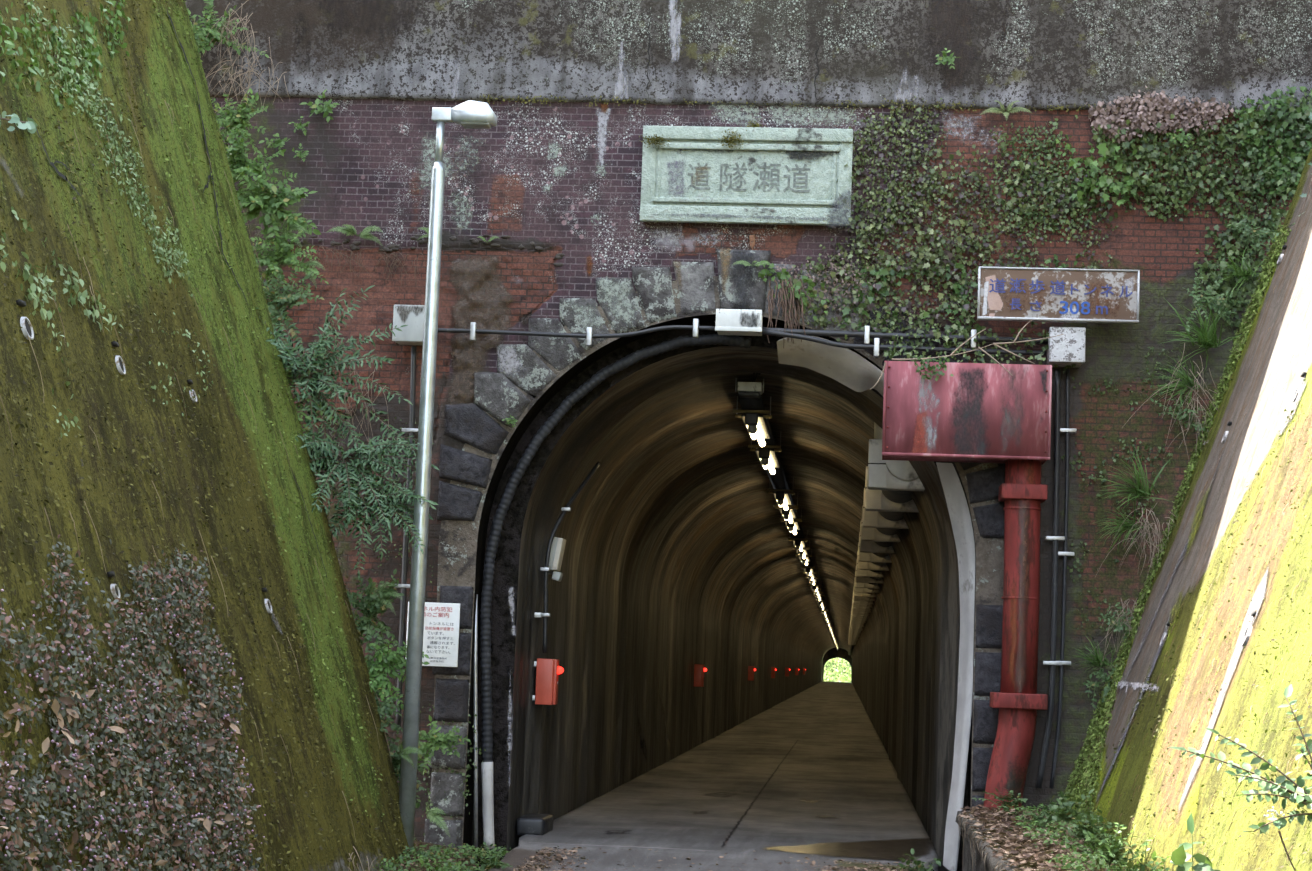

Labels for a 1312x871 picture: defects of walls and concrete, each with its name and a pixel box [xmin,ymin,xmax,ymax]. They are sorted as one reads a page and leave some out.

efflorescence [669,0,681,61]
corrosion [1010,504,1030,694]